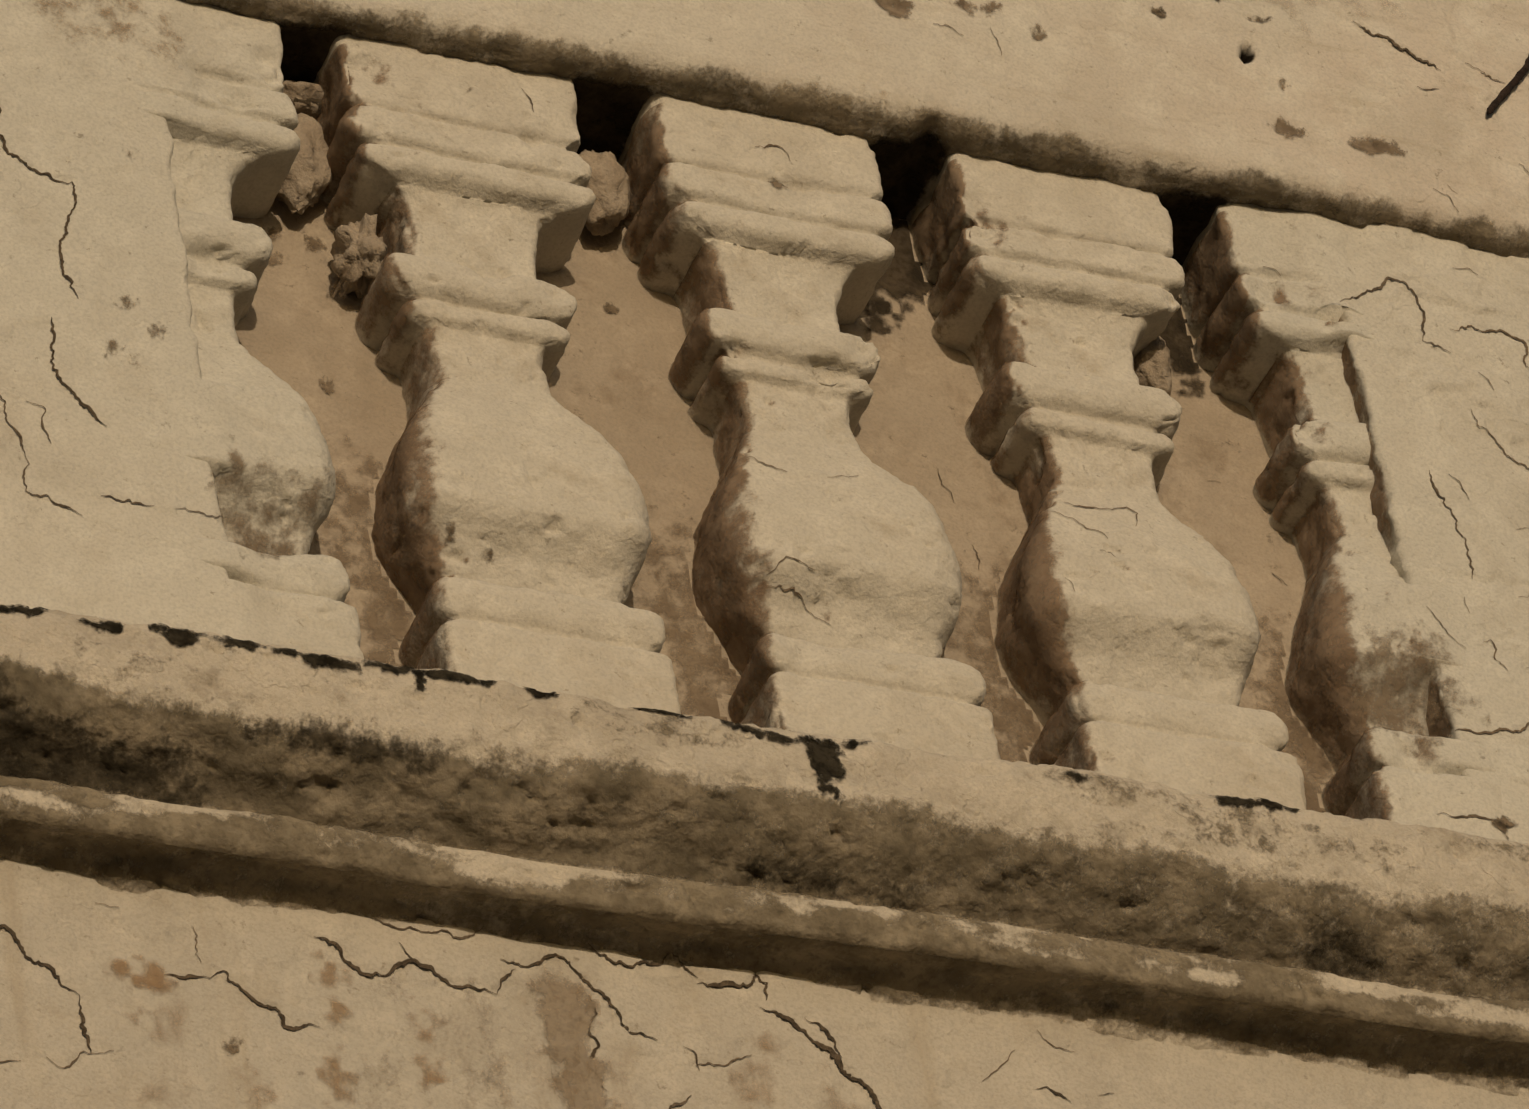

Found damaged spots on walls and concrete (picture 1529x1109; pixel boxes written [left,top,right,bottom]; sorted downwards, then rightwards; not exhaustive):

spalling [876,0,914,17]
spalling [956,0,1002,14]
spalling [1275,116,1305,138]
spalling [1349,137,1408,155]
crack [0,107,223,518]
leakage [912,159,1004,333]
crack [1341,277,1529,368]
leakage [966,298,1097,782]
leakage [1184,211,1391,820]
leakage [148,623,300,656]
crack [0,924,111,1068]
crack [316,920,882,1109]